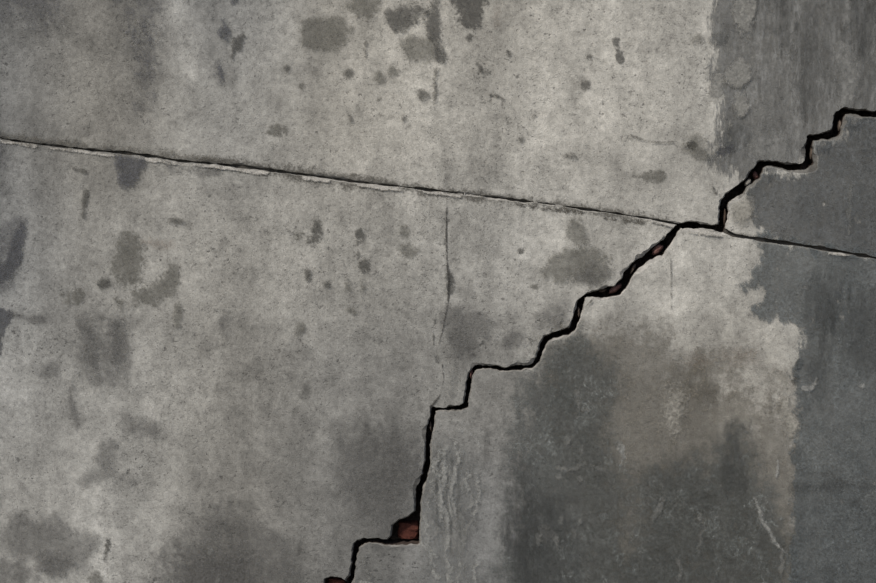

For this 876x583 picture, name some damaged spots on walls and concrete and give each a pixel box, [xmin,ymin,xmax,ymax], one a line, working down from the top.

mould [378,0,445,104]
mould [451,0,489,40]
leakage [0,218,27,289]
leakage [0,308,13,354]
crack [0,107,876,519]
leakage [492,0,876,583]
crack [326,538,421,583]